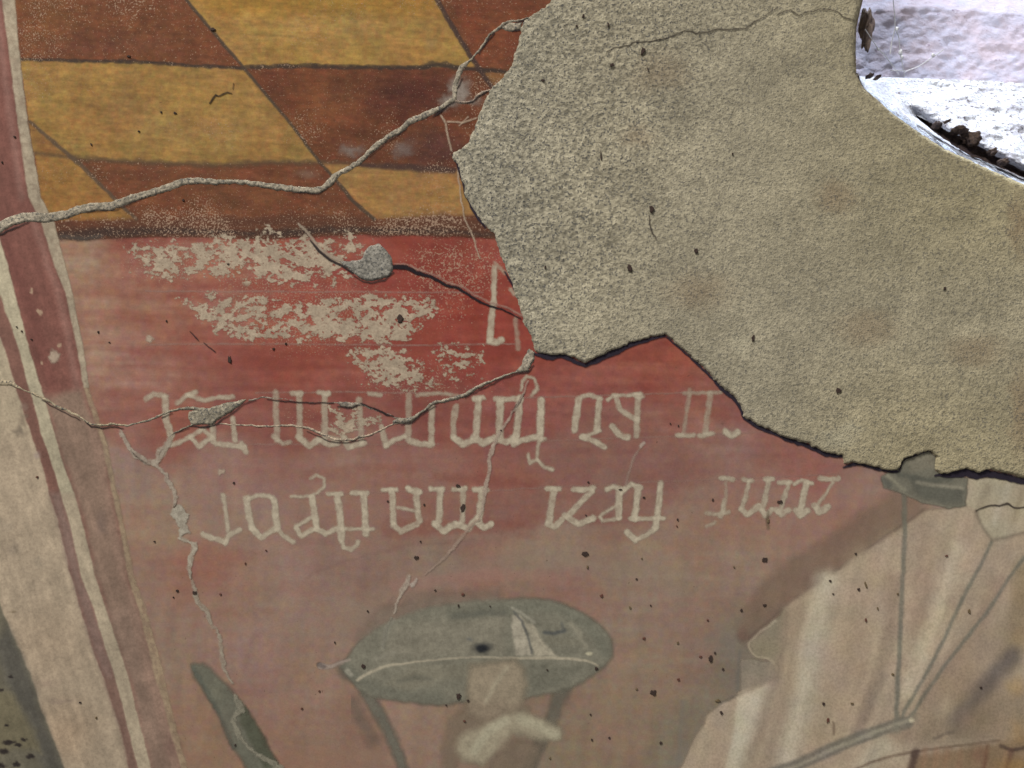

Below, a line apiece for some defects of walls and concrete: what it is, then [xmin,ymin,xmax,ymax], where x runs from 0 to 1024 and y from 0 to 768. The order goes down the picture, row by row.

crack [0,17,529,258]
peeling [128,224,486,394]
crack [298,223,523,319]
peeling [452,0,1024,477]
crack [0,335,1024,768]